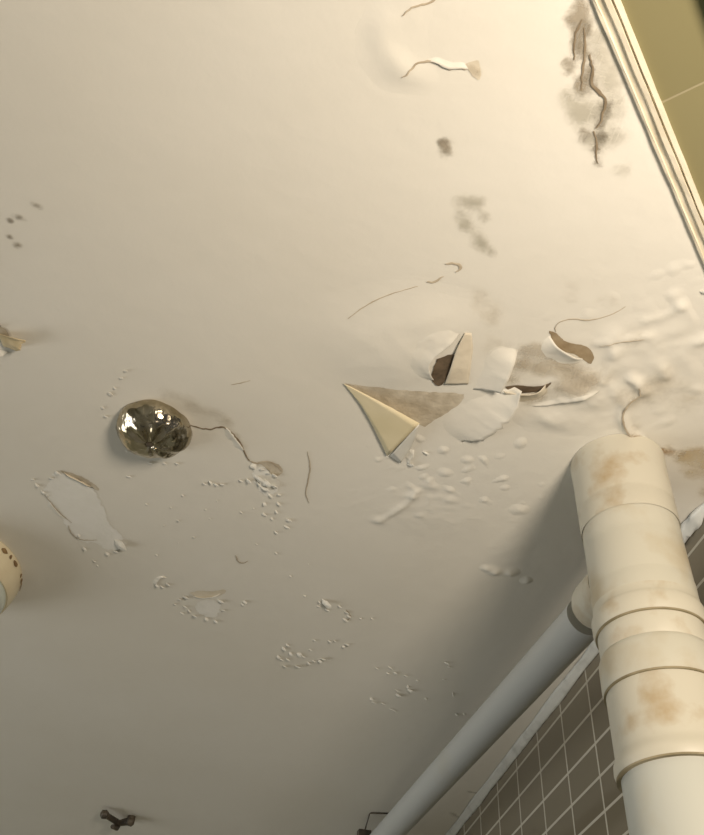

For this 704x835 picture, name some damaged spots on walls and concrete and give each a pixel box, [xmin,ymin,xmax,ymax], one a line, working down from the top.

crack [402,0,435,16]
crack [402,57,481,80]
water stain [568,0,609,163]
crack [348,262,462,319]
peeling [0,327,26,357]
peeling [344,308,623,467]
crack [190,425,292,534]
crack [304,452,312,500]
peeling [31,470,127,557]